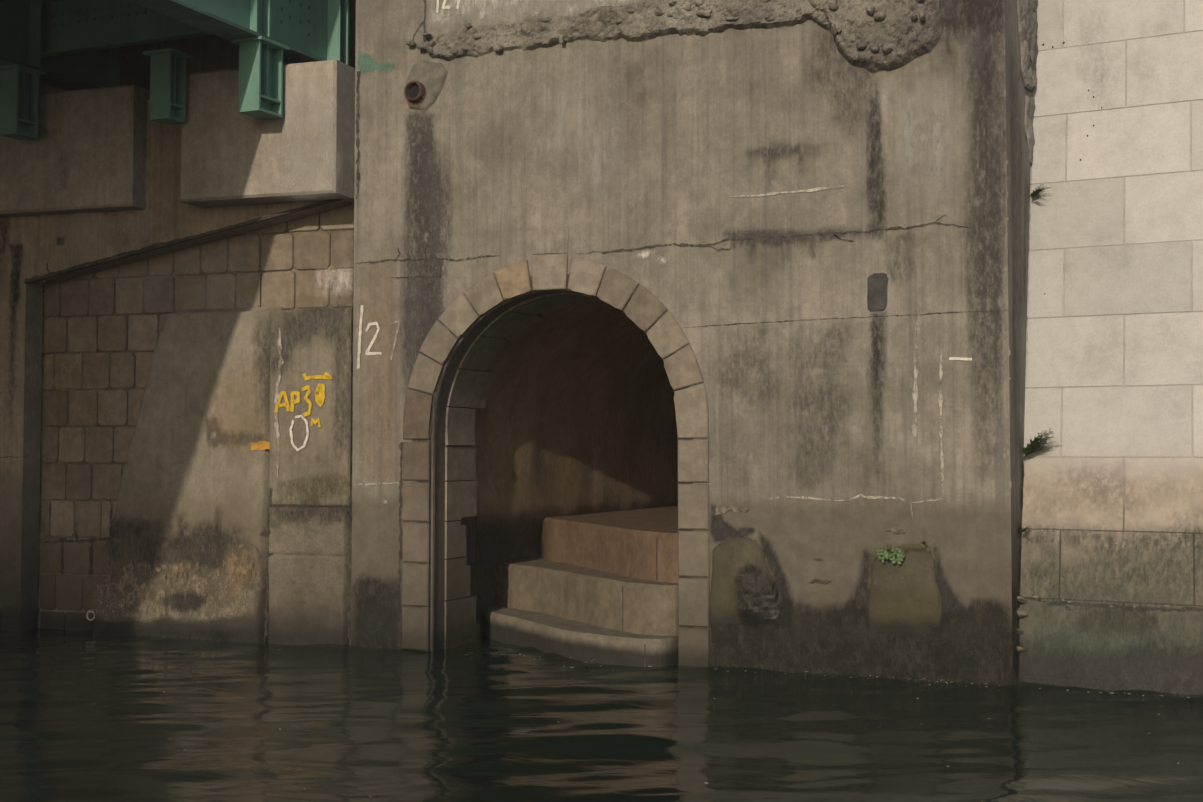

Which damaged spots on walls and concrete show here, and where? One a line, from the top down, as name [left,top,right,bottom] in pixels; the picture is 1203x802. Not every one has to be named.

spalling [405,0,940,74]
spalling [1017,0,1065,165]
leakage [728,38,884,245]
leakage [403,113,449,442]
crack [581,215,973,254]
leakage [935,0,1026,431]
leakage [106,516,241,568]
crack [770,494,943,513]
leakage [712,600,1017,686]